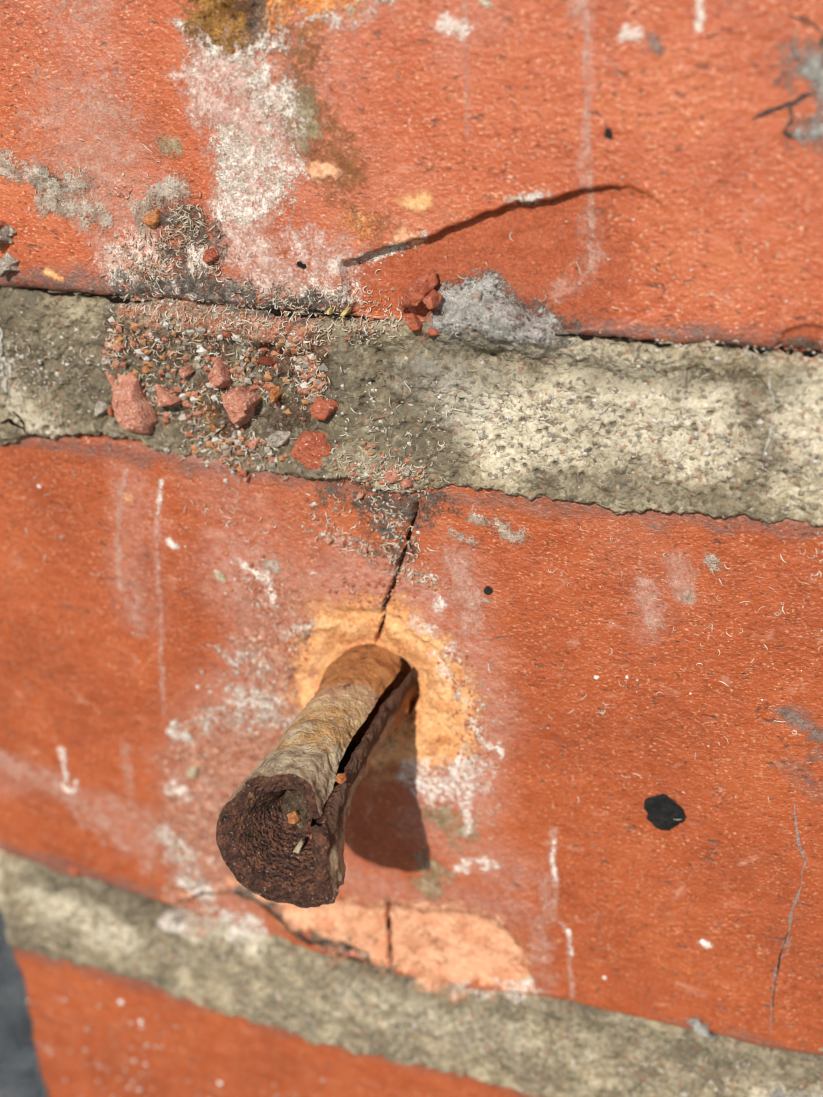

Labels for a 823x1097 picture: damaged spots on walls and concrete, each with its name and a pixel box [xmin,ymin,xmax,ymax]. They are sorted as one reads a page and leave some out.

corrosion [230,0,388,249]
damp [19,15,387,364]
spalling [343,188,632,347]
spalling [105,366,181,435]
spalling [179,365,195,378]
damp [194,395,227,453]
spalling [208,358,282,429]
spalling [289,397,339,470]
crack [378,504,419,642]
corrosion [287,810,300,824]
spalling [148,558,542,1004]
crack [174,891,393,974]